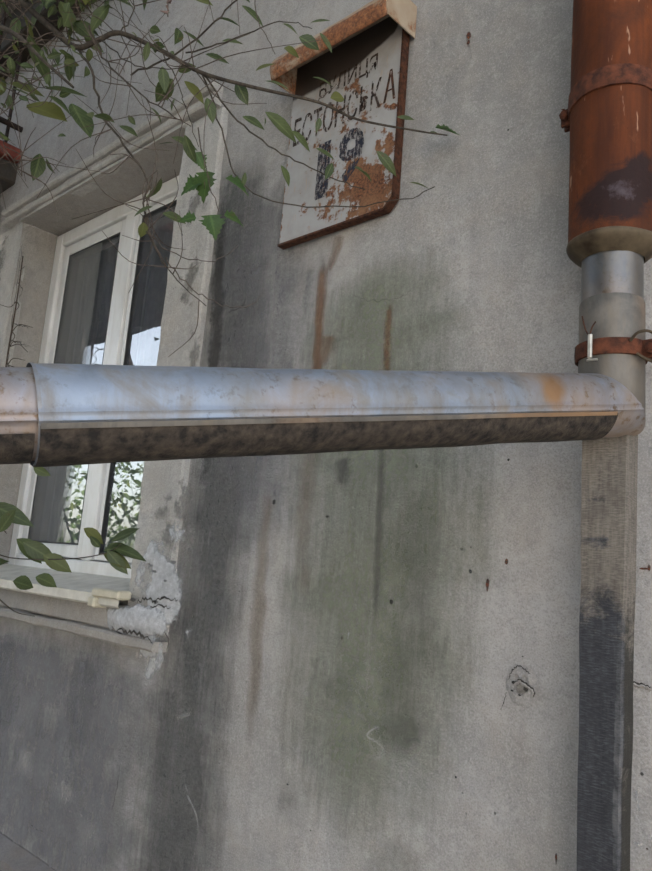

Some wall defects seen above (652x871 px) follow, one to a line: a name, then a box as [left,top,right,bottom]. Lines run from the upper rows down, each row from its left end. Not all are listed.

water stain [209,180,295,369]
corrosion [313,272,324,369]
water stain [328,275,439,371]
water stain [147,455,280,871]
water stain [307,448,448,795]
crack [633,681,651,692]